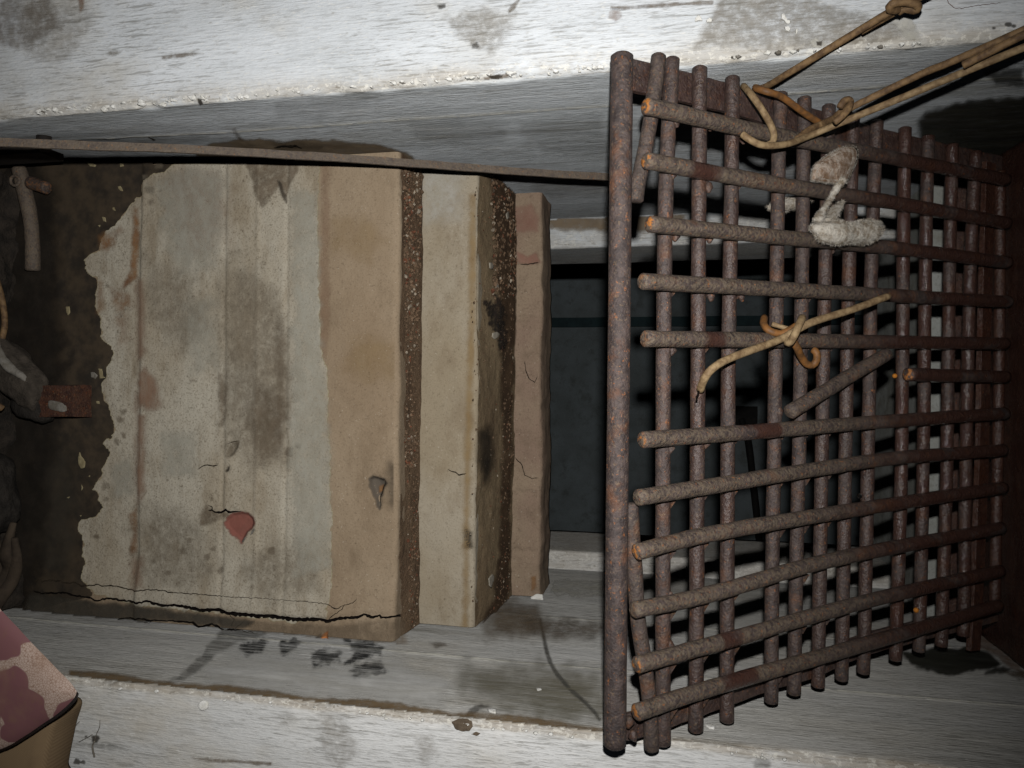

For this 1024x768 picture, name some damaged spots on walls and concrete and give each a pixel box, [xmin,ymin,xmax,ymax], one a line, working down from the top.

spalling [369,476,387,509]
spalling [201,506,255,543]
crack [34,579,401,633]